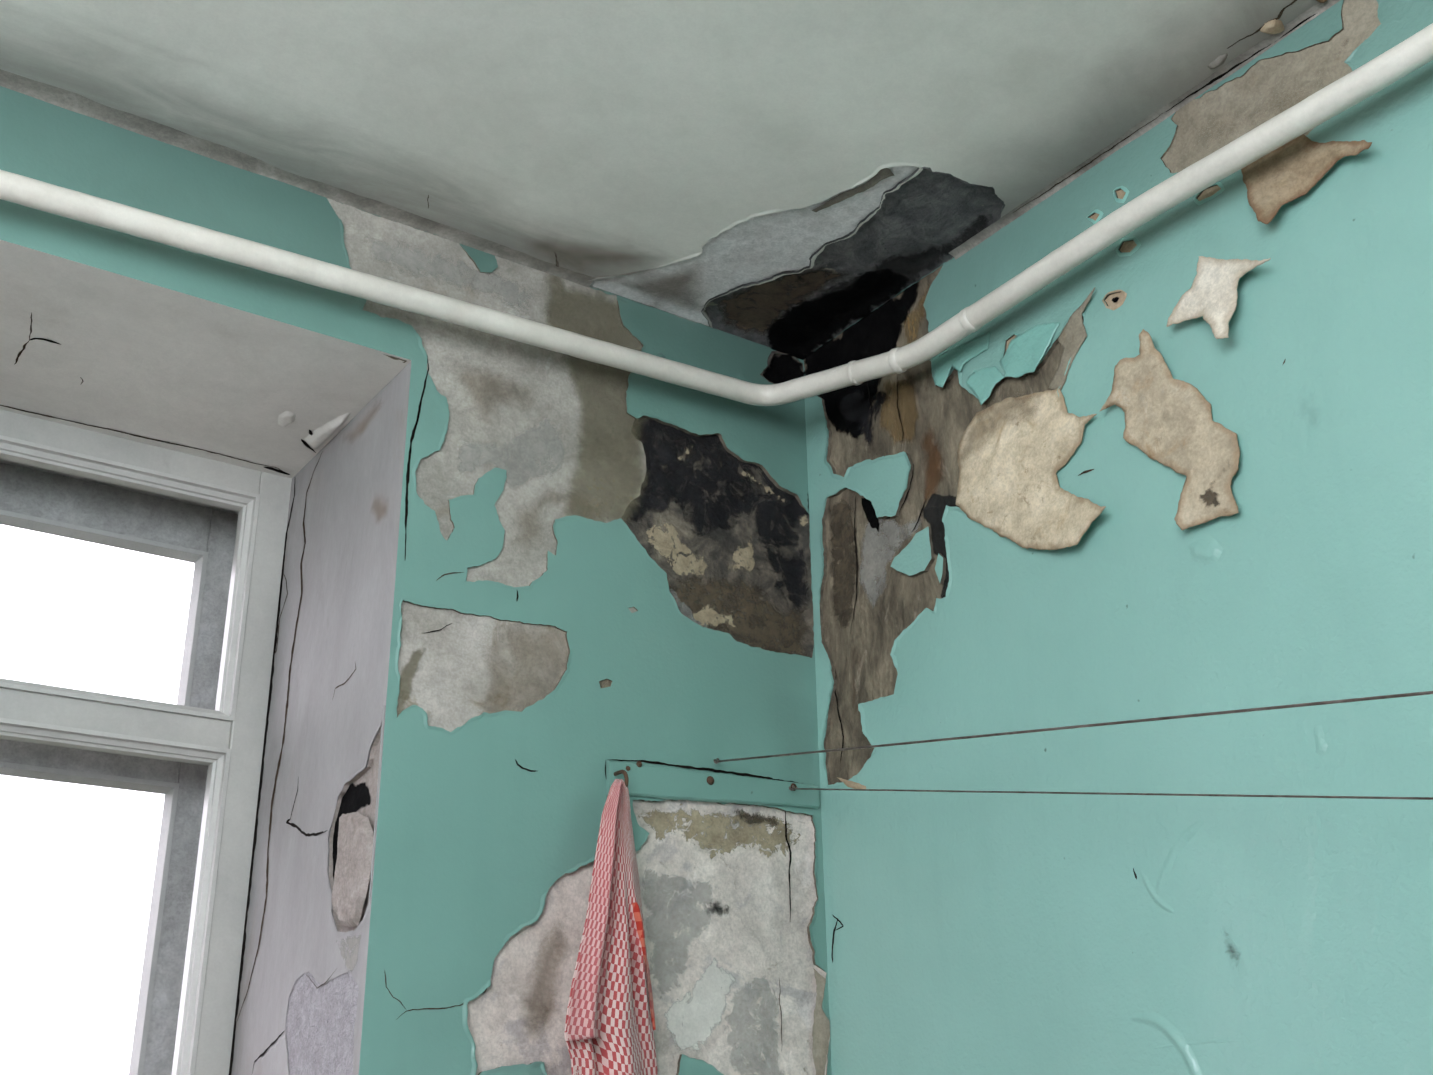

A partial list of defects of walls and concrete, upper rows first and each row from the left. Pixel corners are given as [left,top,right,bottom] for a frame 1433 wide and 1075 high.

crack [14,312,61,365]
flaking render [301,413,351,453]
spalling [326,162,1005,384]
flaking render [359,287,1240,788]
damp [767,215,988,360]
peeling [1166,256,1271,339]
flaking render [1158,0,1382,175]
peeling [1241,128,1372,224]
crack [0,405,327,1075]
flaking render [252,598,573,1075]
flaking render [462,856,595,1075]
flaking render [632,797,831,1075]